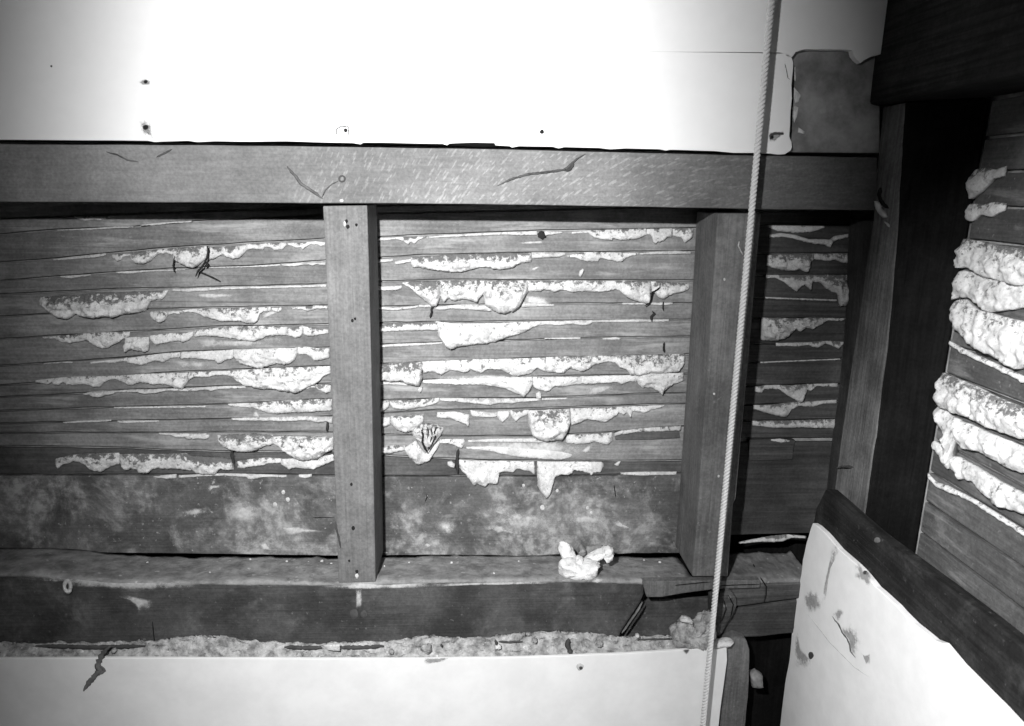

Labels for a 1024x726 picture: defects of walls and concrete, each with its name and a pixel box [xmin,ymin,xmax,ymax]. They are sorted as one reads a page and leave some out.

crack [287,166,338,199]
crack [498,154,585,186]
leakage [806,553,834,609]
crack [83,646,110,691]